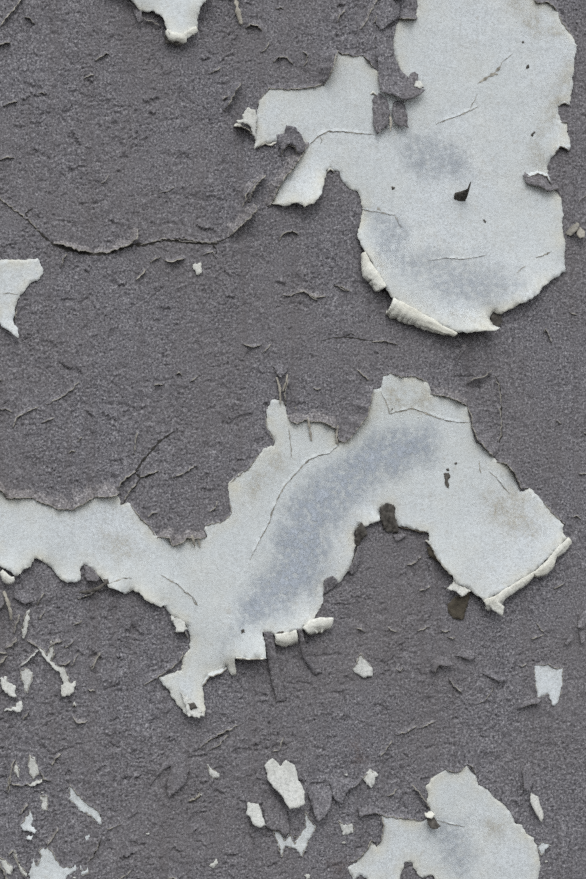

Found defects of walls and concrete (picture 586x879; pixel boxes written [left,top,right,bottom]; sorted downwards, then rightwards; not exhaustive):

peeling [130,0,206,46]
peeling [234,0,585,337]
peeling [0,258,43,338]
peeling [135,250,218,280]
peeling [0,345,581,724]
crack [250,432,339,560]
peeling [0,752,90,879]
peeling [68,784,120,830]
peeling [246,737,378,858]
peeling [338,763,550,879]